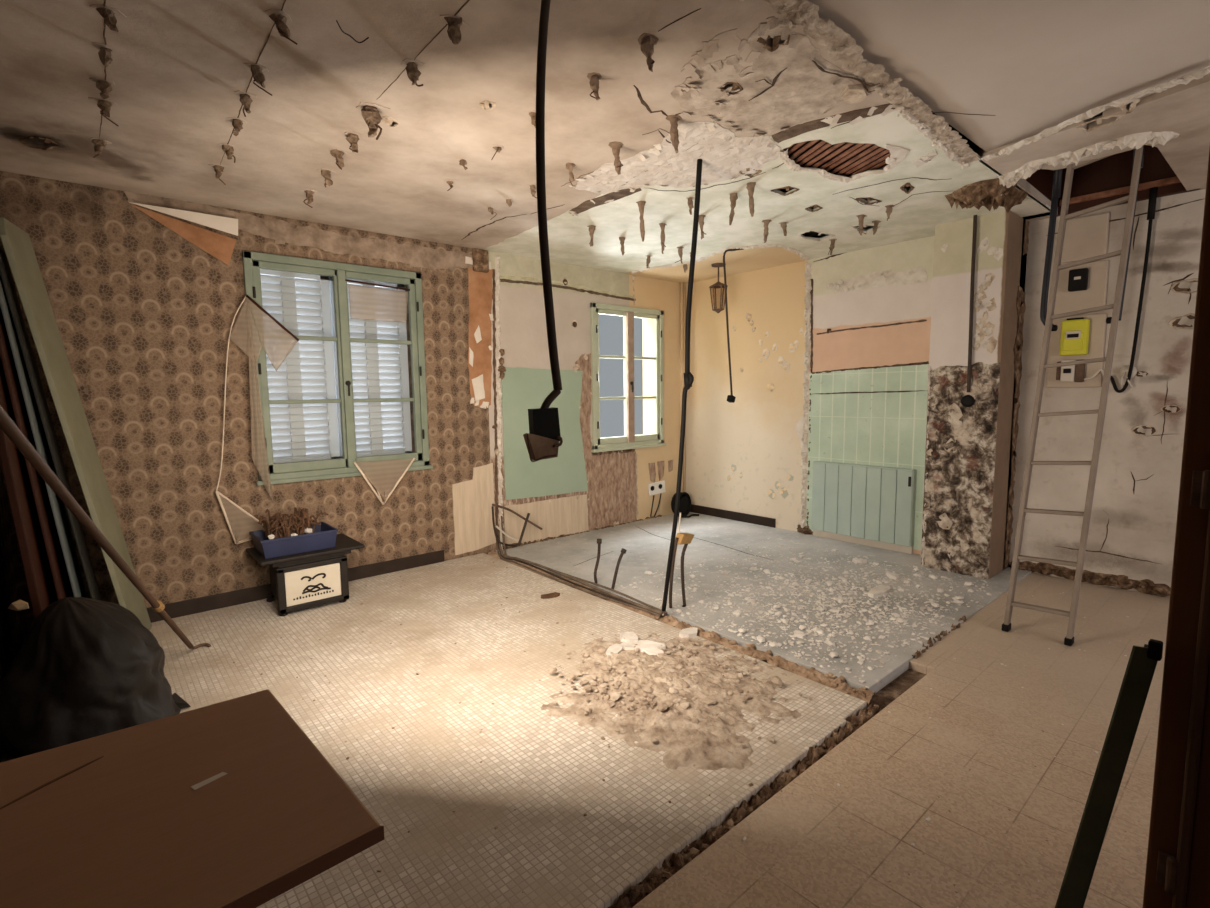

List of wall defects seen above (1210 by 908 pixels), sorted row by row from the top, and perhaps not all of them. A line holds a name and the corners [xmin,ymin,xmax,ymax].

damp [3,129,63,147]
flaking render [675,0,1210,169]
flaking render [945,131,1180,213]
flaking render [124,191,633,409]
flaking render [504,353,637,544]
spalling [921,237,1026,579]